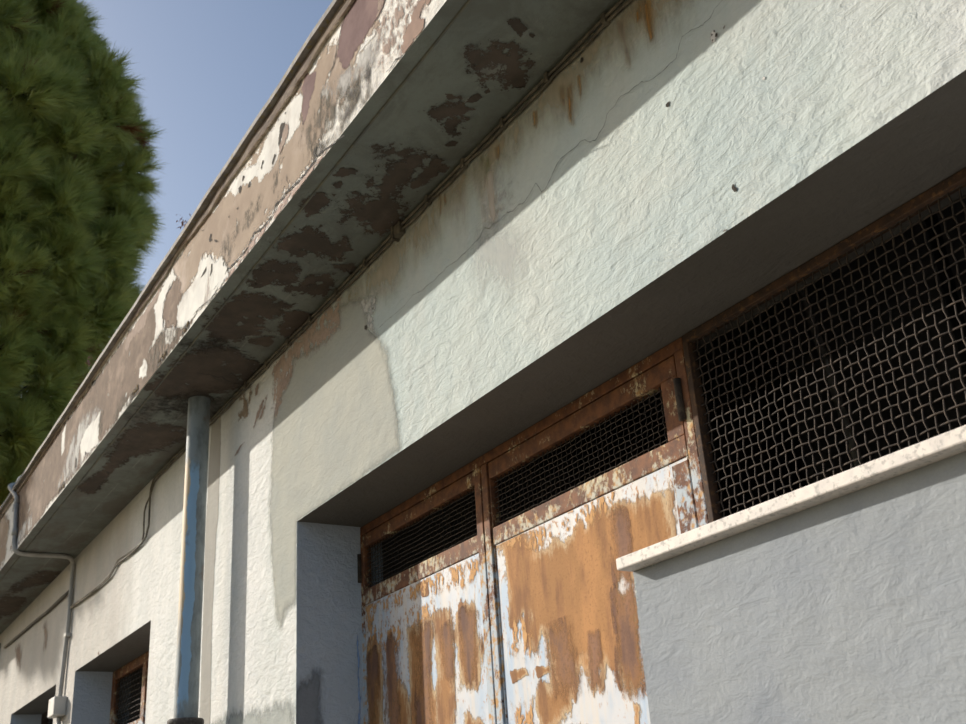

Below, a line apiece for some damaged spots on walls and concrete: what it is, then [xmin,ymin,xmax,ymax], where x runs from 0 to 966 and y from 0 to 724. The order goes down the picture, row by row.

peeling [0,0,450,568]
peeling [427,18,536,147]
crack [380,0,722,327]
peeling [0,570,62,620]
corrosion [365,559,485,724]
corrosion [496,481,677,724]